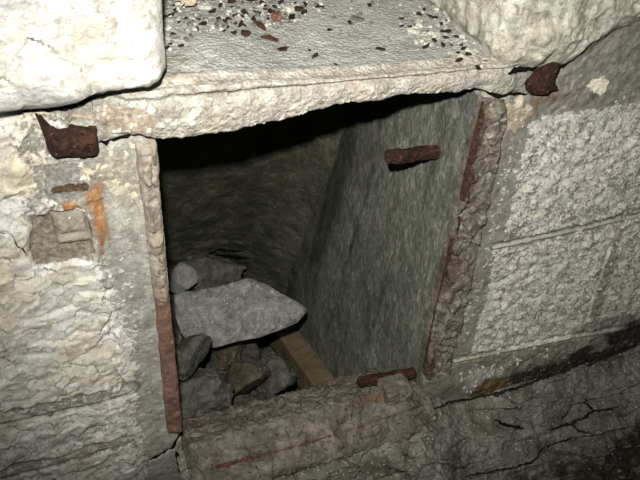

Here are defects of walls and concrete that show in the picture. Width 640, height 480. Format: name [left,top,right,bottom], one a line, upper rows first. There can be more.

corrosion [85,186,106,247]
corrosion [423,102,484,368]
crack [427,344,638,425]
damp [471,321,640,396]
crack [465,399,622,477]